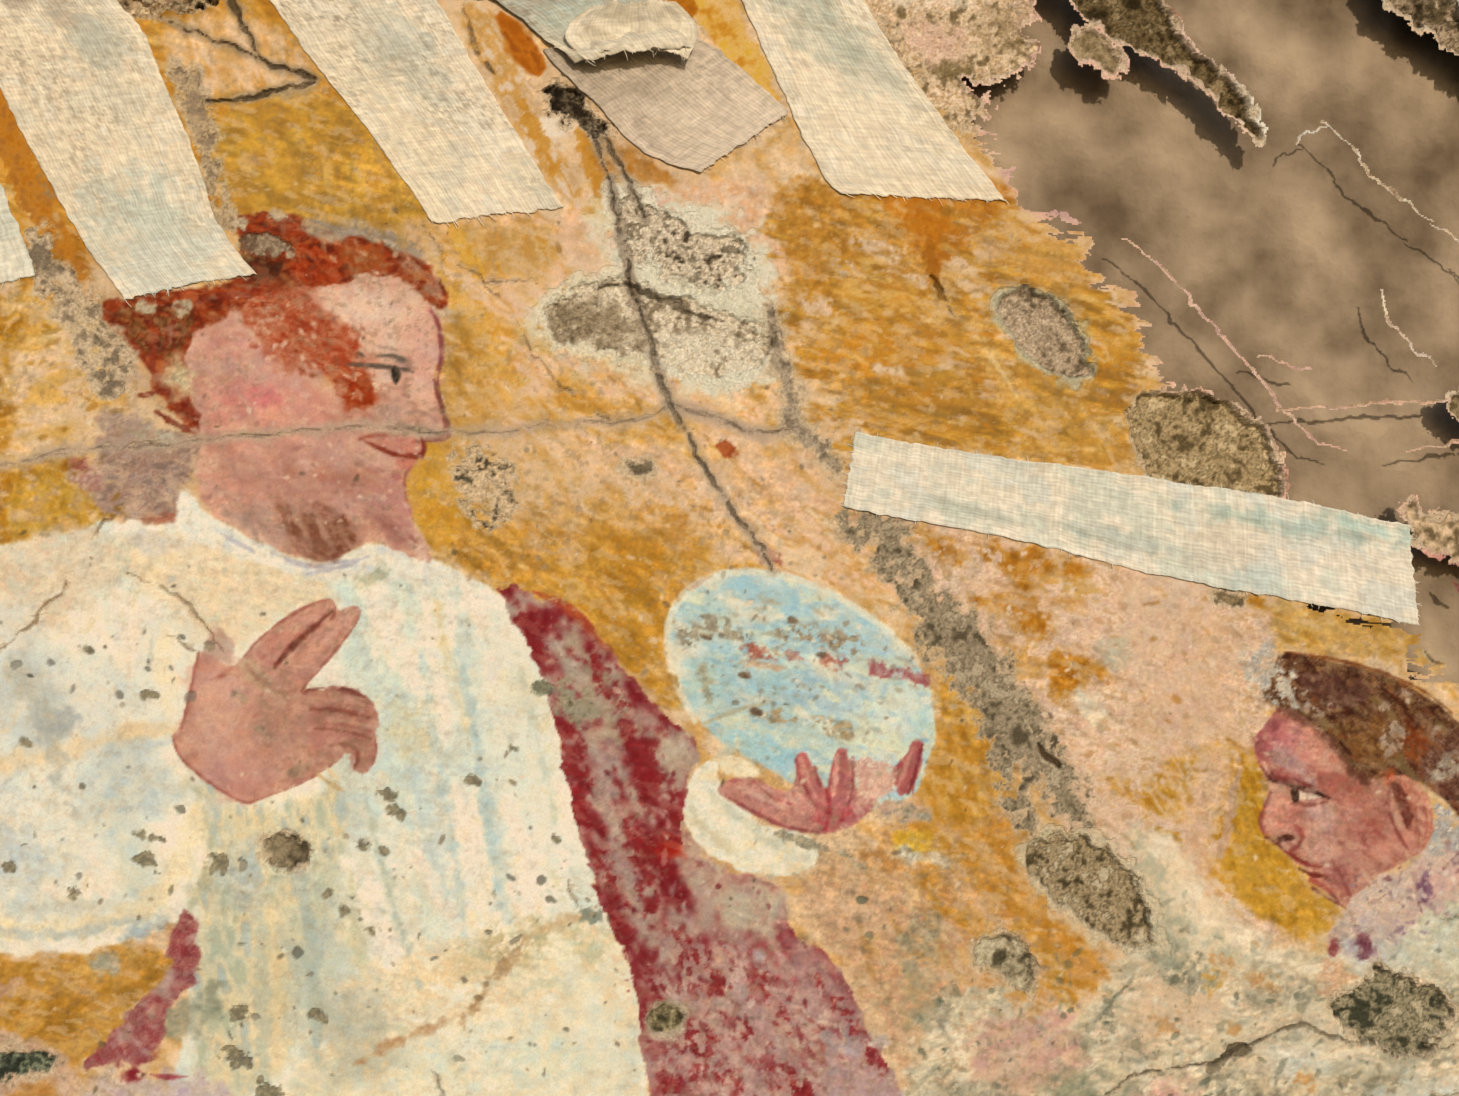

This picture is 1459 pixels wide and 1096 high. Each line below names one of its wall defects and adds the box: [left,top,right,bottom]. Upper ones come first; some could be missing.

crack [168,0,320,104]
flaking render [866,0,1042,143]
flaking render [1068,0,1268,147]
crack [1296,120,1459,242]
crack [0,125,800,574]
flaking render [533,182,850,484]
crack [1121,238,1451,451]
flaking render [1122,381,1291,499]
crack [1406,439,1459,452]
crack [0,581,67,651]
flaking render [825,502,1169,962]
flaking render [1326,959,1459,1070]